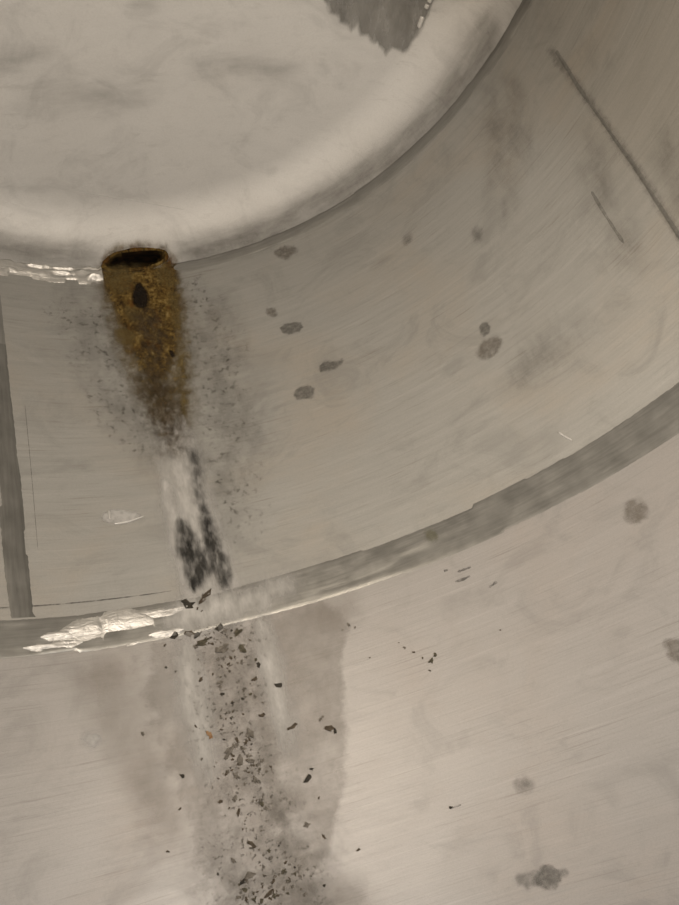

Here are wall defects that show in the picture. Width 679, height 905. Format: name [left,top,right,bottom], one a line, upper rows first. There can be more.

corrosion [101,244,190,445]
leakage [162,417,291,627]
leakage [179,645,211,763]
leakage [257,620,290,740]